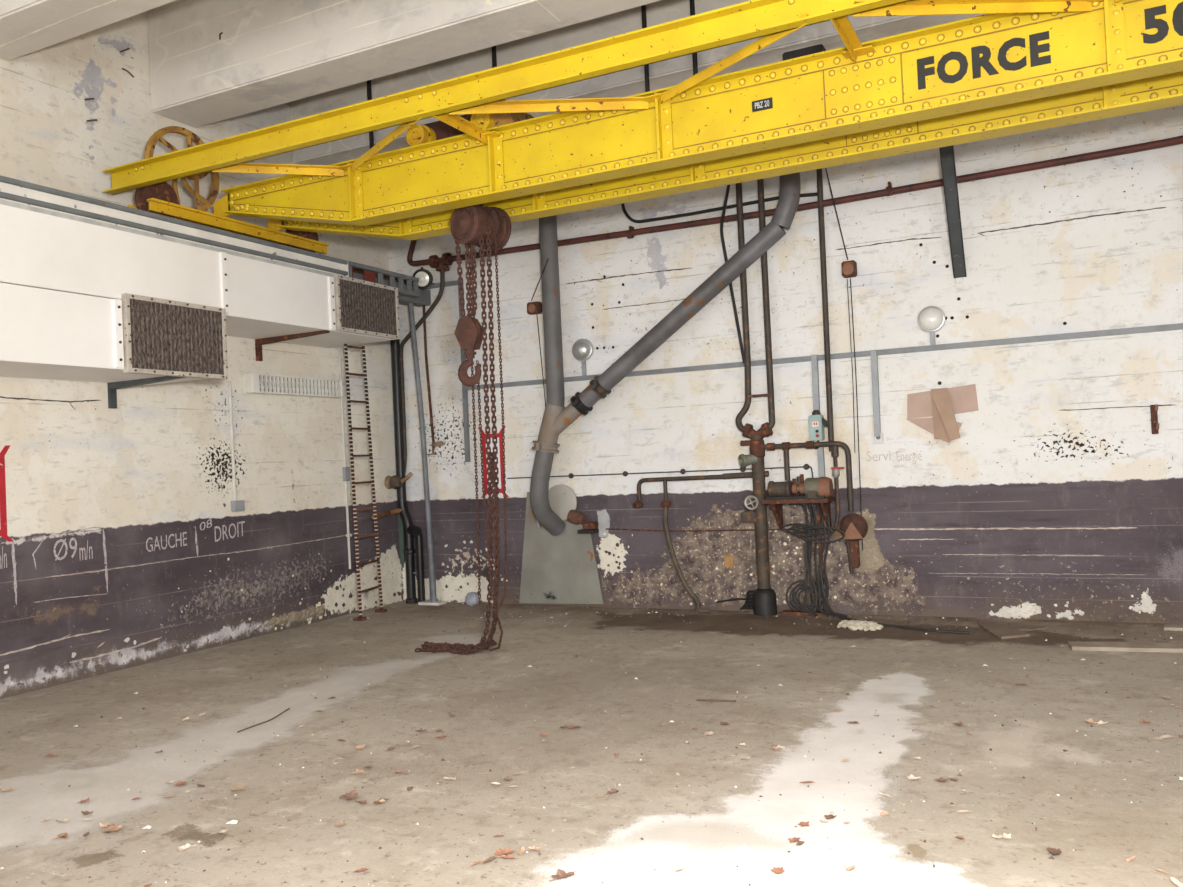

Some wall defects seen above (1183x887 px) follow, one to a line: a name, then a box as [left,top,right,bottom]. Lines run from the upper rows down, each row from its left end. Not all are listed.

water stain [196,386,247,506]
water stain [416,395,482,475]
water stain [1032,427,1124,462]
water stain [0,600,317,696]
peeling [160,540,508,630]
peeling [596,498,927,615]
peeling [1129,588,1157,614]
water stain [0,632,499,869]
water stain [299,596,1183,887]